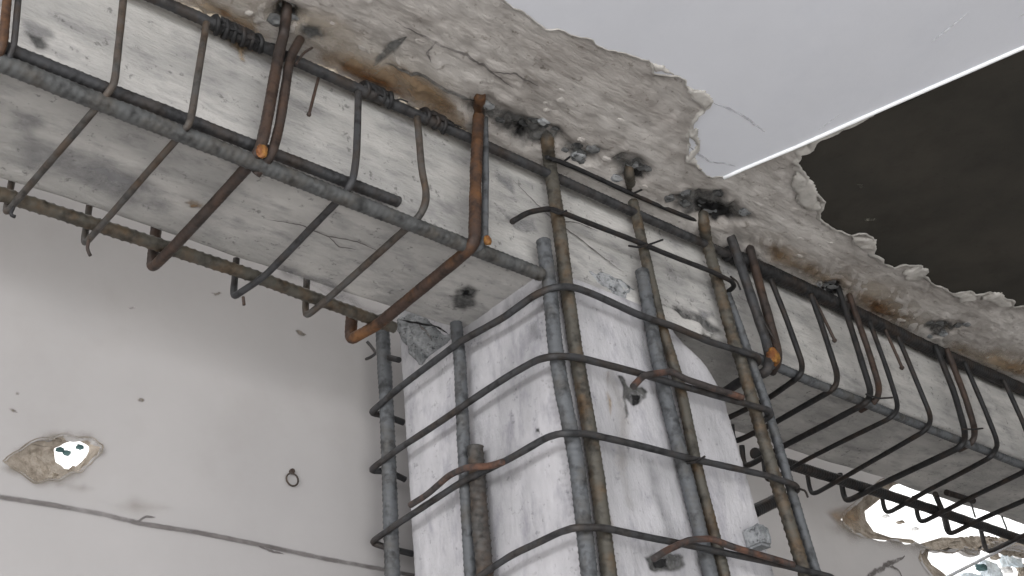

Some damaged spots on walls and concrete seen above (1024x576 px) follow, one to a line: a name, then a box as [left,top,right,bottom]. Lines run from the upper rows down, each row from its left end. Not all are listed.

spalling [0,41,468,252]
corrosion [326,56,461,123]
spalling [144,0,1024,414]
spalling [0,186,494,576]
spalling [550,360,618,576]
spalling [643,320,731,576]
spalling [747,408,1024,576]
spalling [773,364,1024,469]